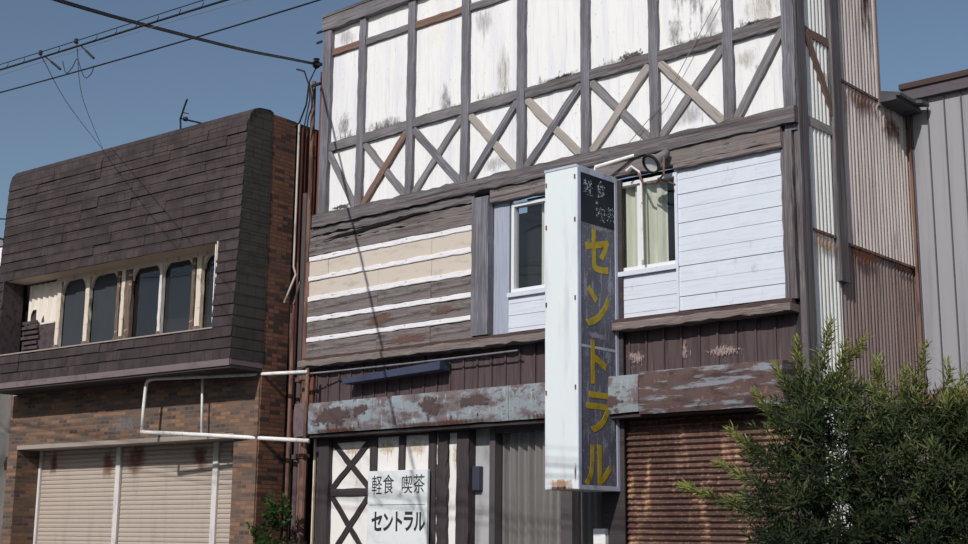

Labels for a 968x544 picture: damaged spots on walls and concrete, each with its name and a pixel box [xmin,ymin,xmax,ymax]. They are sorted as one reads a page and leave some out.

rust [846,90,899,155]
peeling [313,404,367,426]
peeling [418,396,442,421]
peeling [459,393,489,407]
rust [127,448,142,470]